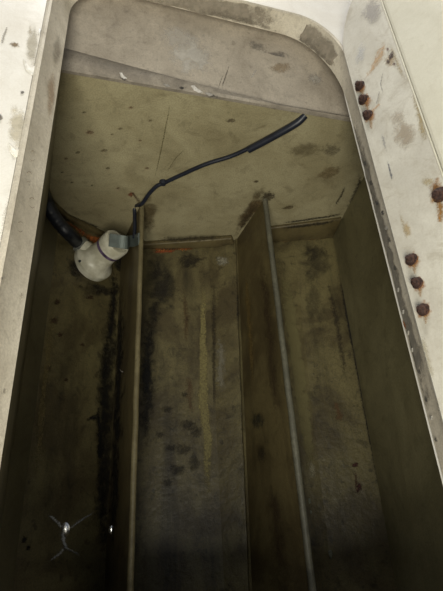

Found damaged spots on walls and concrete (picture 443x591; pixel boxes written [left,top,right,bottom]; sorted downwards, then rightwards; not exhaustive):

water stain [300,25,337,65]
rust [426,178,443,221]
water stain [86,277,124,543]
water stain [140,331,153,434]
water stain [198,299,212,483]